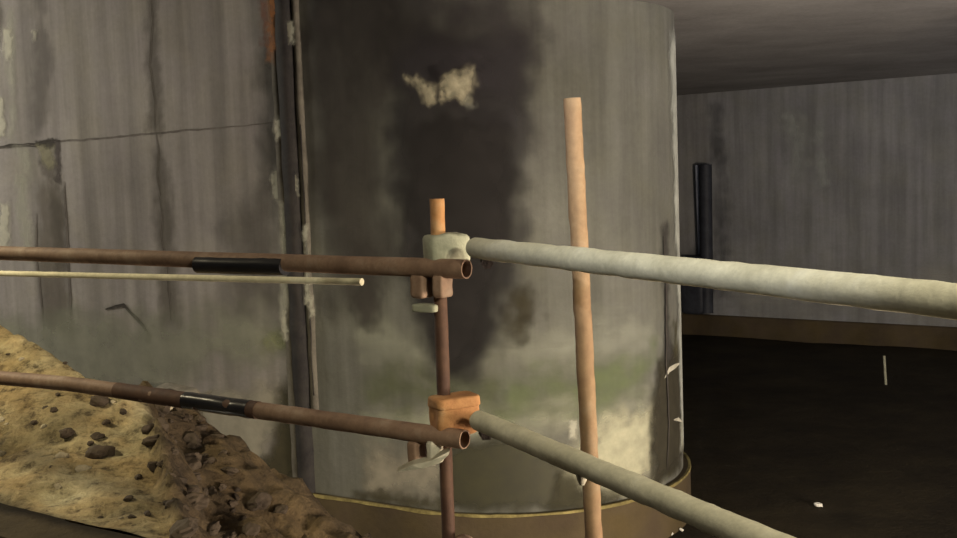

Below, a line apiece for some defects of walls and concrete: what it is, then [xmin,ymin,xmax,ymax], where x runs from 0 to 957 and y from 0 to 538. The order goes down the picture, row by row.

spalling [403,67,474,105]
crack [0,0,274,329]
leakage [312,0,531,258]
leakage [663,35,680,257]
crack [105,303,147,331]
leakage [1,316,288,382]
leakage [338,274,375,324]
leakage [415,297,436,354]
leakage [447,257,531,377]
leakage [597,283,684,483]
leakage [357,453,441,511]
leakage [452,431,584,511]